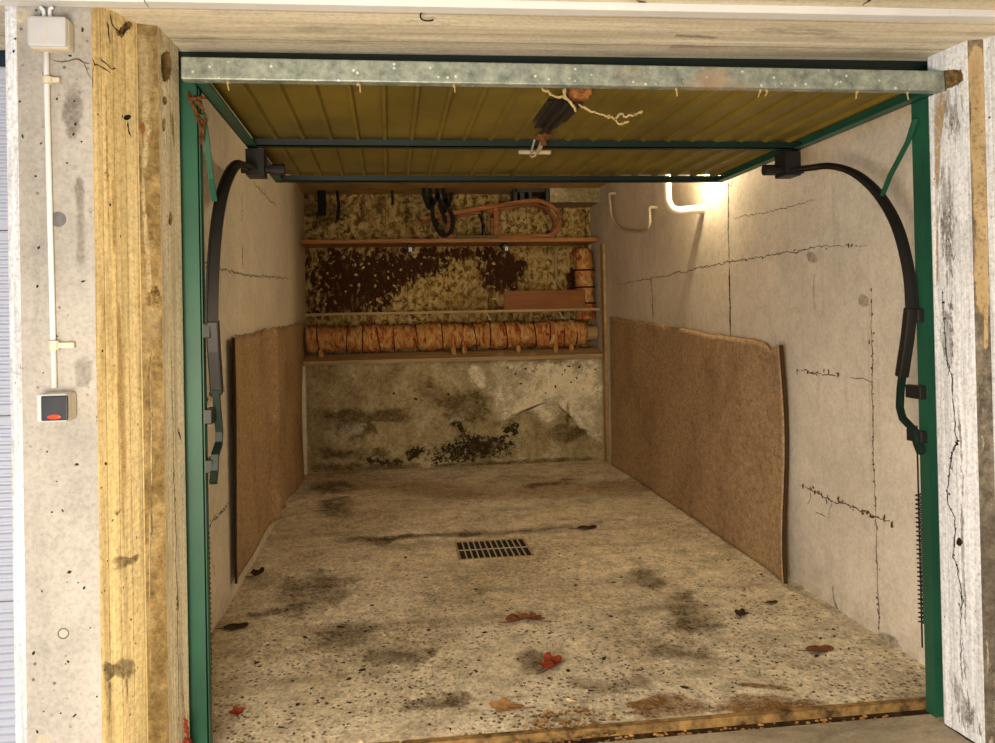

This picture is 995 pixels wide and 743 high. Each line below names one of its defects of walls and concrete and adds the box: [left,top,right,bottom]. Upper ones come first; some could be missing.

damp [314,390,592,472]
crack [942,292,964,683]
damp [353,524,573,544]